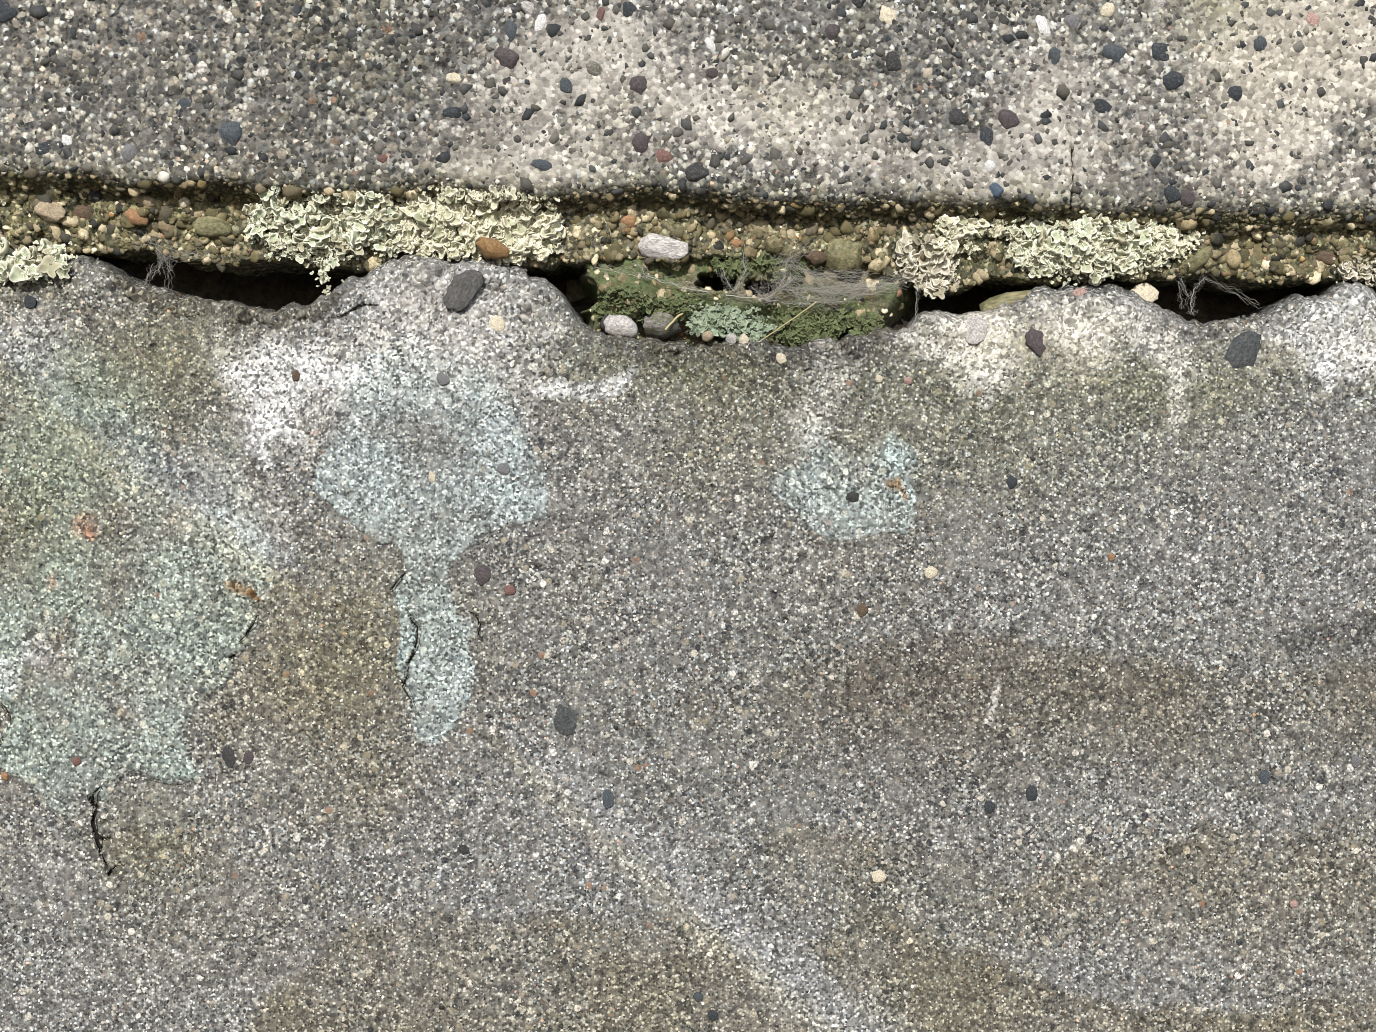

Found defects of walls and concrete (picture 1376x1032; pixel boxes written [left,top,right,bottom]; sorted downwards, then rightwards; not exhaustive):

spalling [90,256,353,329]
spalling [573,309,916,360]
spalling [1182,313,1266,335]
peeling [69,322,234,446]
peeling [0,398,264,825]
peeling [309,410,550,739]
crack [29,786,122,875]